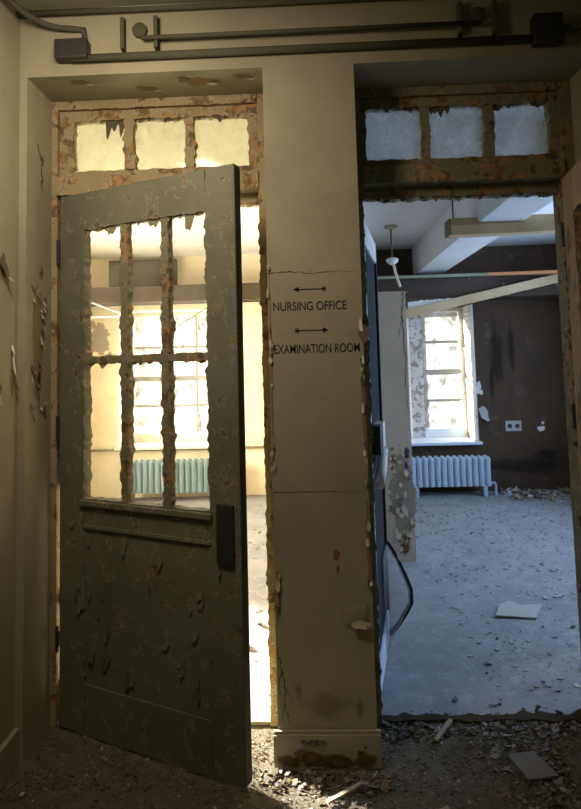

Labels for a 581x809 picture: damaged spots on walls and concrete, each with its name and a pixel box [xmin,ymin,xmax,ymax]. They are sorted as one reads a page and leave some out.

peeling [90,120,125,140]
peeling [31,282,48,422]
peeling [388,447,418,552]